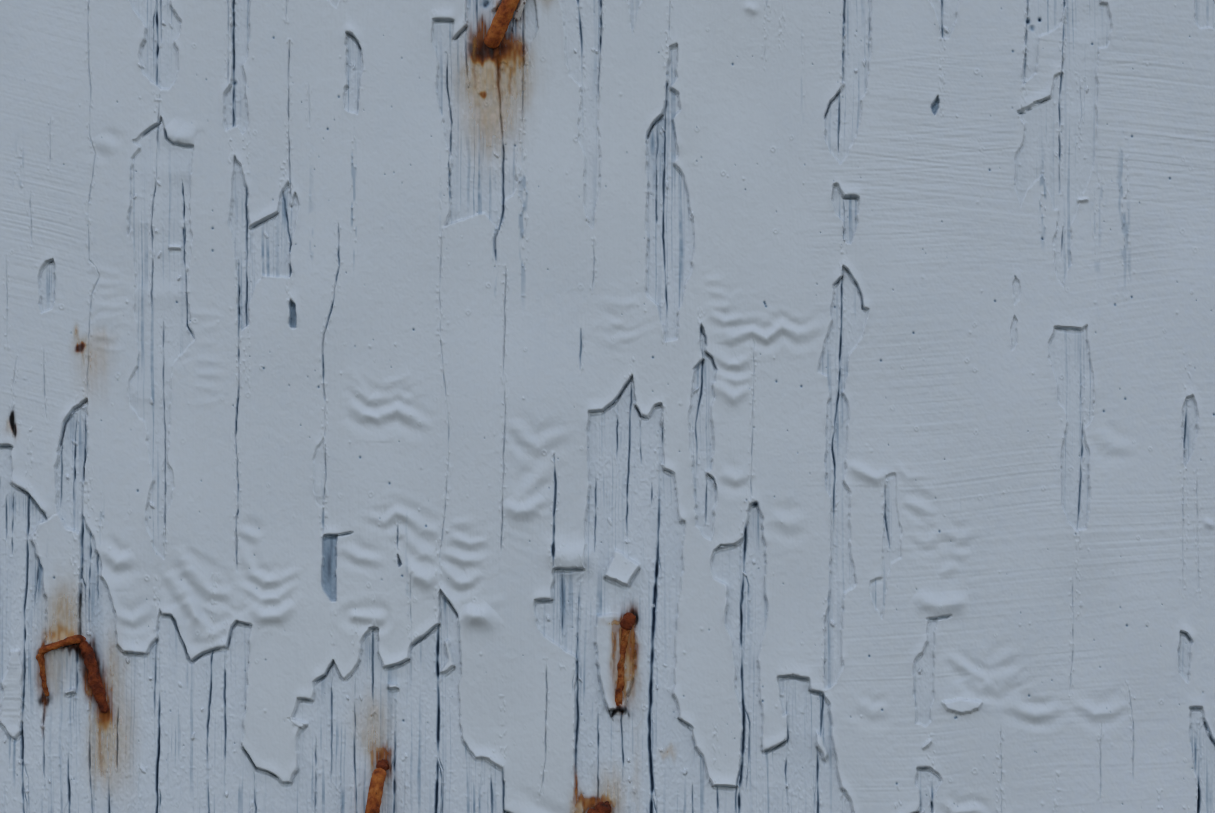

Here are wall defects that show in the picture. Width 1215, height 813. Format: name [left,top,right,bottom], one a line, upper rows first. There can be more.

corrosion [466,16,525,137]
crack [0,0,119,813]
corrosion [37,600,116,770]
crack [206,0,257,813]
peeling [0,398,510,813]
corrosion [573,776,616,813]
crack [539,361,665,813]
corrosion [609,607,639,717]
peeling [532,265,905,813]
crack [692,341,755,813]
peeling [1046,324,1097,534]
peeling [1188,706,1215,813]